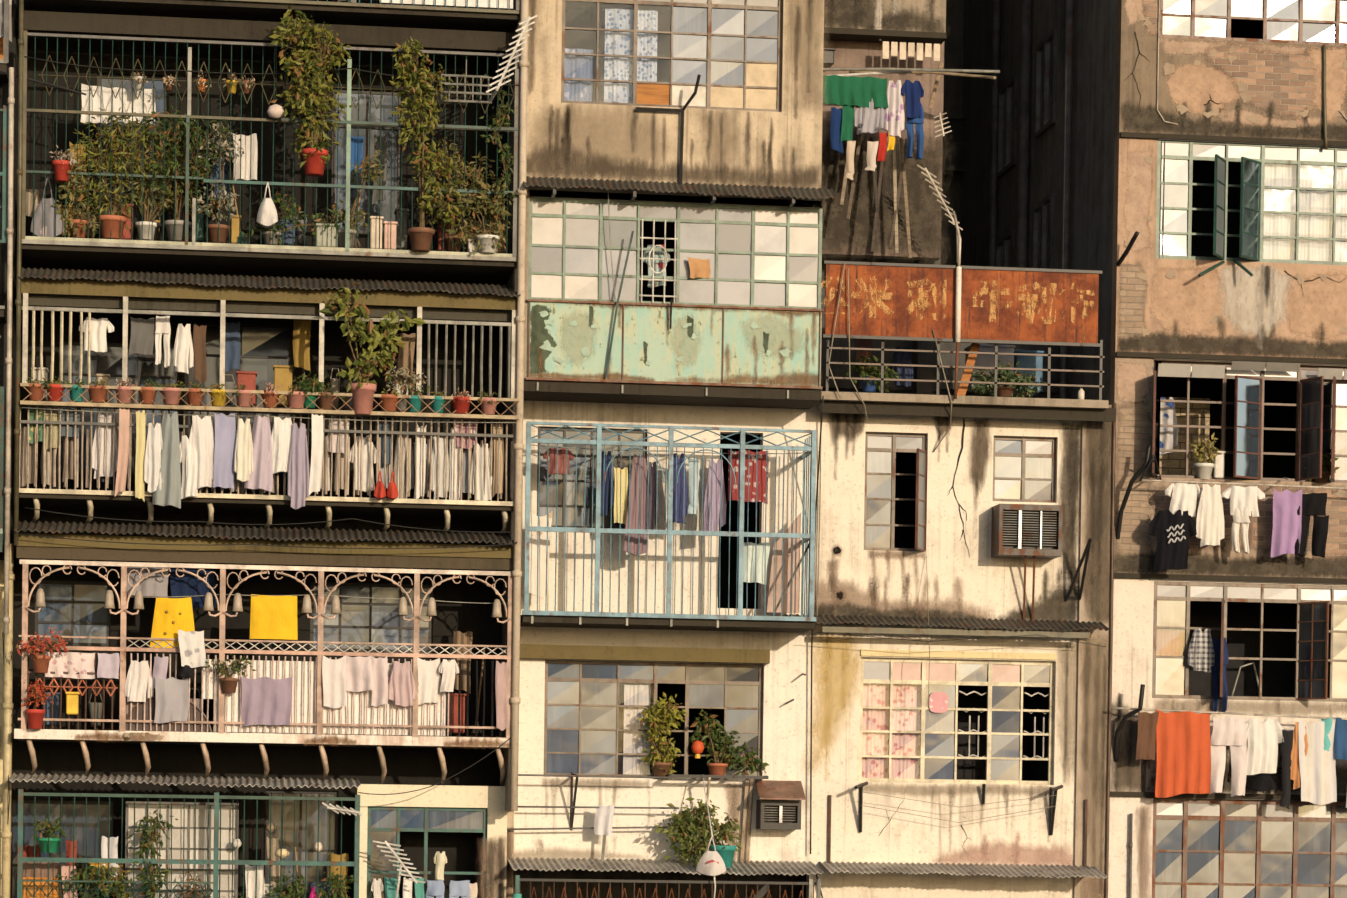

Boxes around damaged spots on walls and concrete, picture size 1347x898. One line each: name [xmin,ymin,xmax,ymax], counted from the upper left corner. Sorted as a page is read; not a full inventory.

leakage [795,0,944,79]
crack [1124,32,1149,117]
flaking render [1125,0,1347,128]
leakage [526,107,832,210]
peeling [528,305,597,374]
peeling [674,316,698,364]
peeling [746,317,799,357]
leakage [829,413,864,452]
crack [949,418,970,557]
leakage [971,420,988,492]
leakage [1003,421,1347,622]
leakage [815,561,986,747]